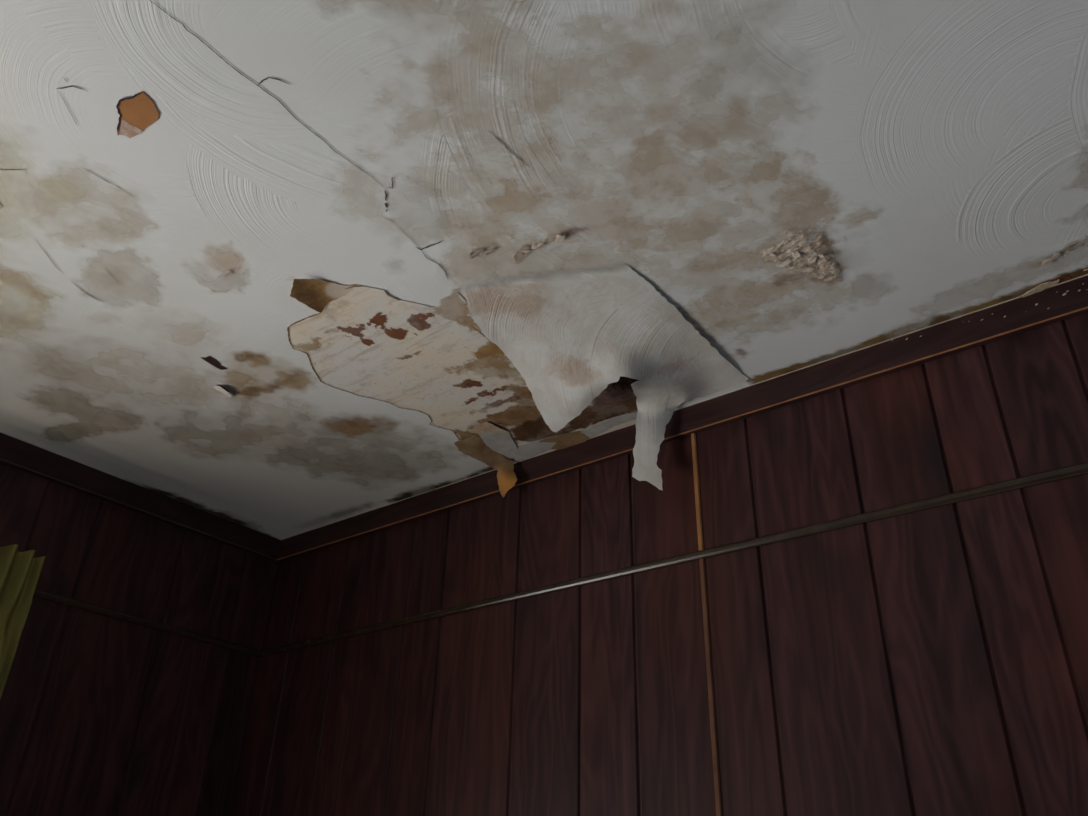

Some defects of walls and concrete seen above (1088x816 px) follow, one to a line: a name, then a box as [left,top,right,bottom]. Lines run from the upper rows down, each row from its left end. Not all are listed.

peeling [116,92,159,138]
crack [150,0,448,279]
damp [398,0,881,340]
damp [0,158,157,305]
damp [0,272,50,337]
damp [30,353,141,439]
damp [228,352,310,399]
damp [154,368,413,484]
peeling [287,286,639,463]